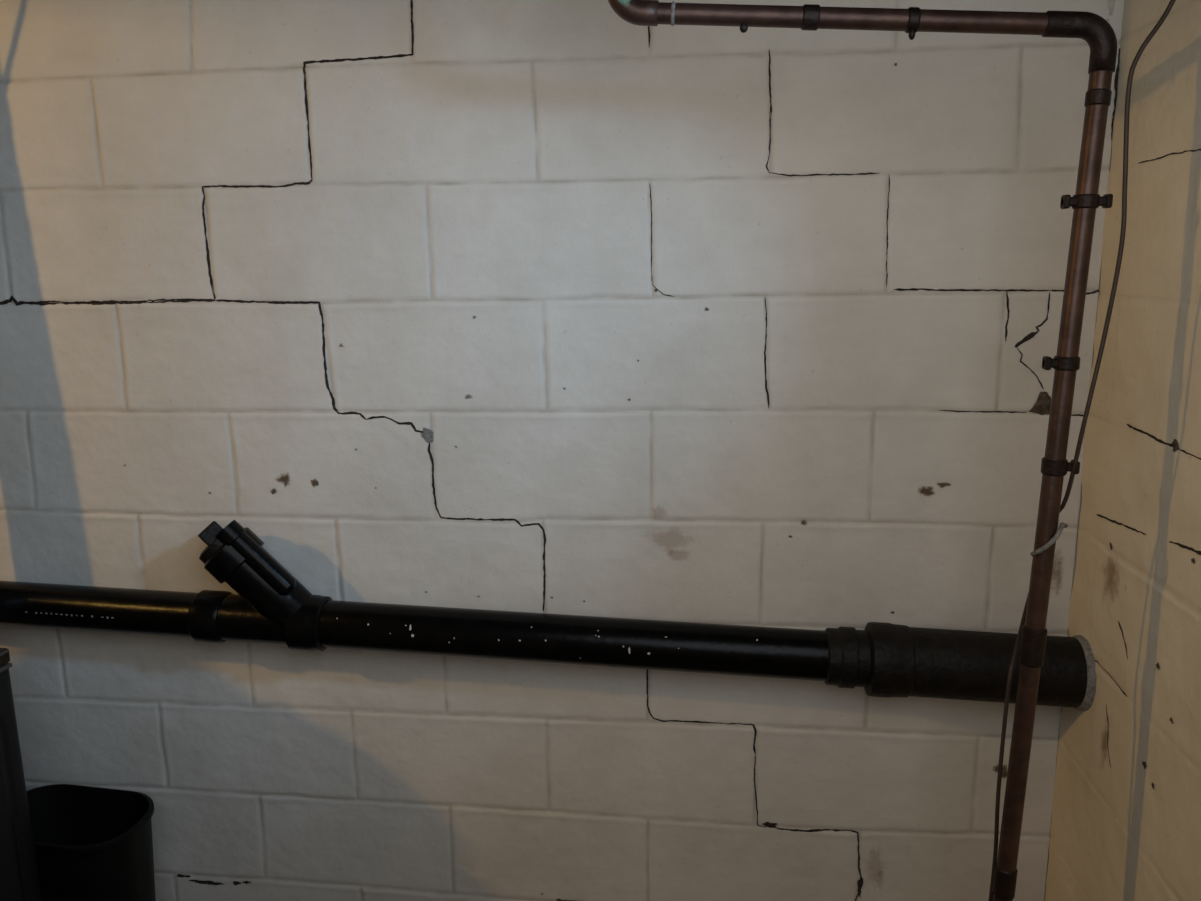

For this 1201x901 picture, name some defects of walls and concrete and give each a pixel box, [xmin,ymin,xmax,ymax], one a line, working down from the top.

crack [0,0,546,611]
crack [766,49,1099,389]
crack [941,407,1026,415]
crack [646,669,863,901]